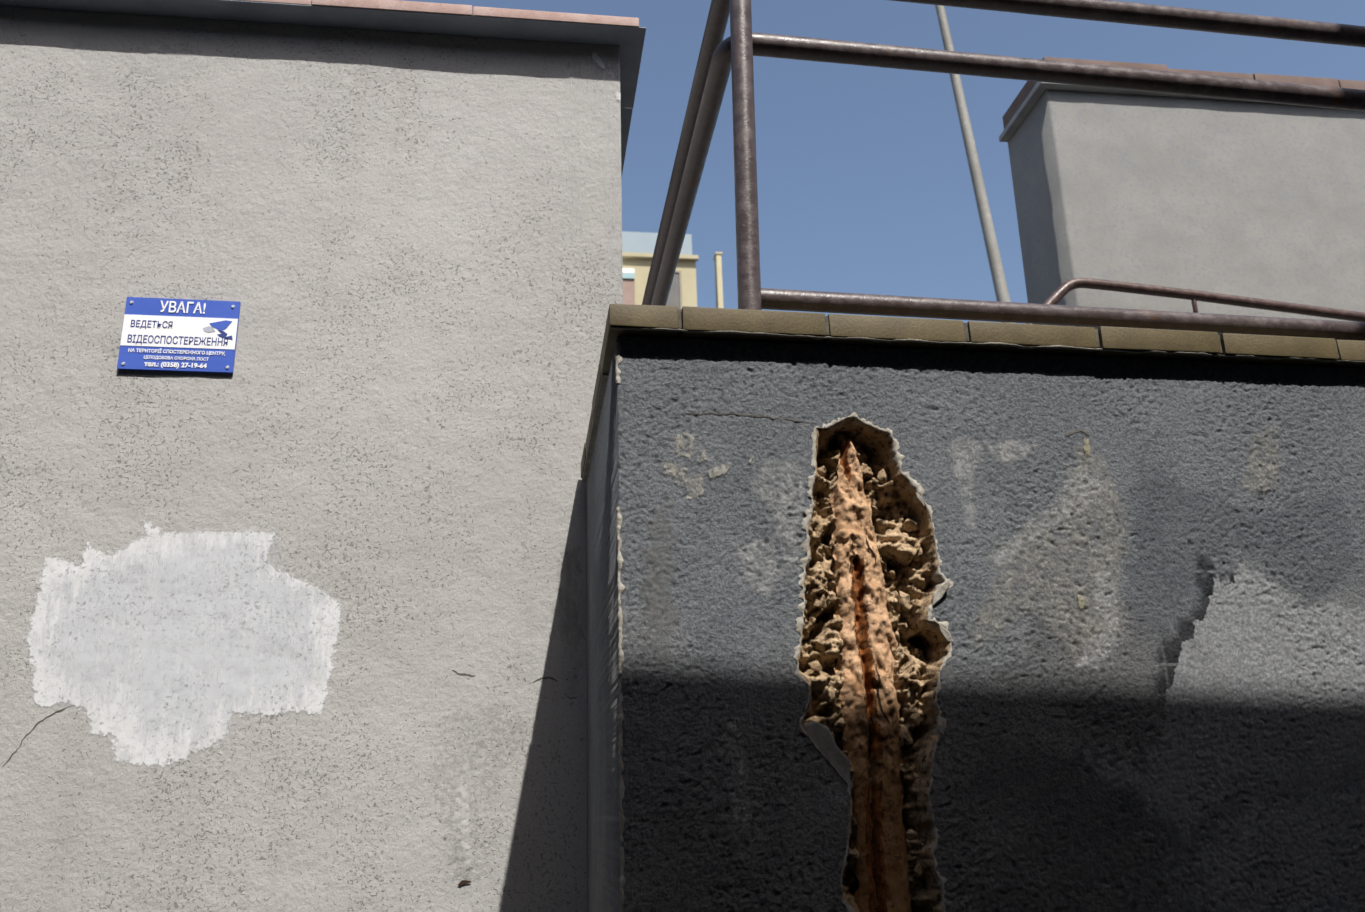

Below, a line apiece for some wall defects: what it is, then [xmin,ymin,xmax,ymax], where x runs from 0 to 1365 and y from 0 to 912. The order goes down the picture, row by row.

corrosion [839,441,852,483]
corrosion [851,555,885,762]
spalling [793,412,953,912]
corrosion [863,779,888,912]